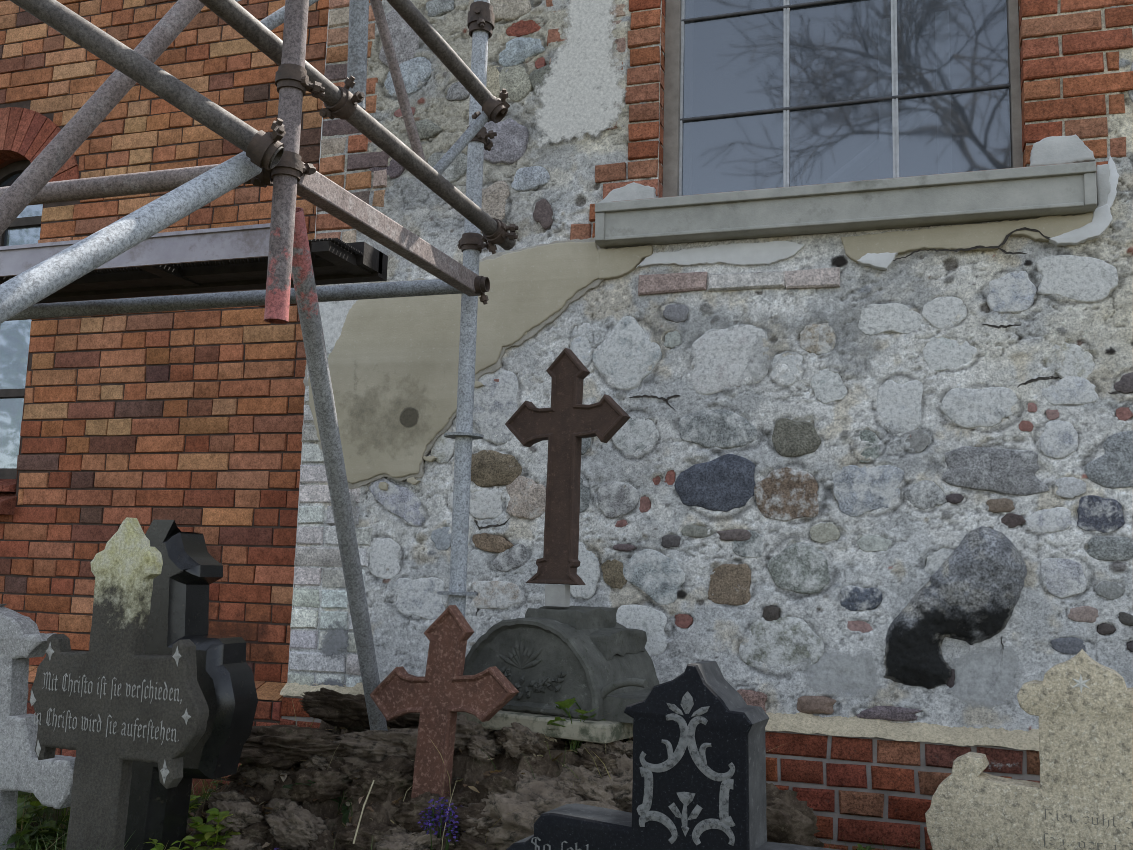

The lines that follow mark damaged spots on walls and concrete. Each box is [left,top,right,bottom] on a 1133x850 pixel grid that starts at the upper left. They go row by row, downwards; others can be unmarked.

peeling [535,0,625,147]
flaking render [832,156,1119,271]
flaking render [474,237,805,388]
flaking render [303,360,322,450]
flaking render [318,294,461,490]
damp [393,402,418,428]